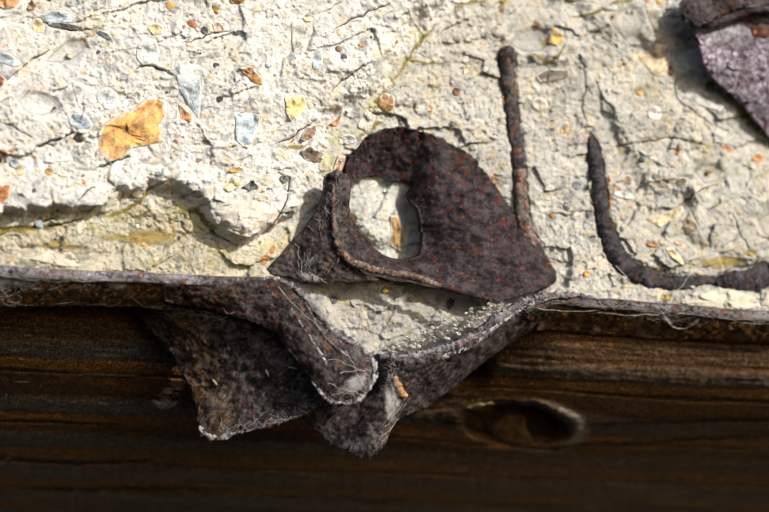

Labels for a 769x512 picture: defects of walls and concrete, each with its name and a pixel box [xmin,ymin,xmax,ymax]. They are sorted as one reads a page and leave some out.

crack [26,16,98,35]
crack [332,3,390,33]
rust [700,21,769,49]
crack [136,65,175,76]
crack [0,122,76,148]
crack [275,121,314,144]
crack [96,155,130,168]
crack [0,187,96,236]
crack [271,176,291,226]
peeling [71,220,86,235]
peeling [30,251,82,267]
rust [392,375,408,398]